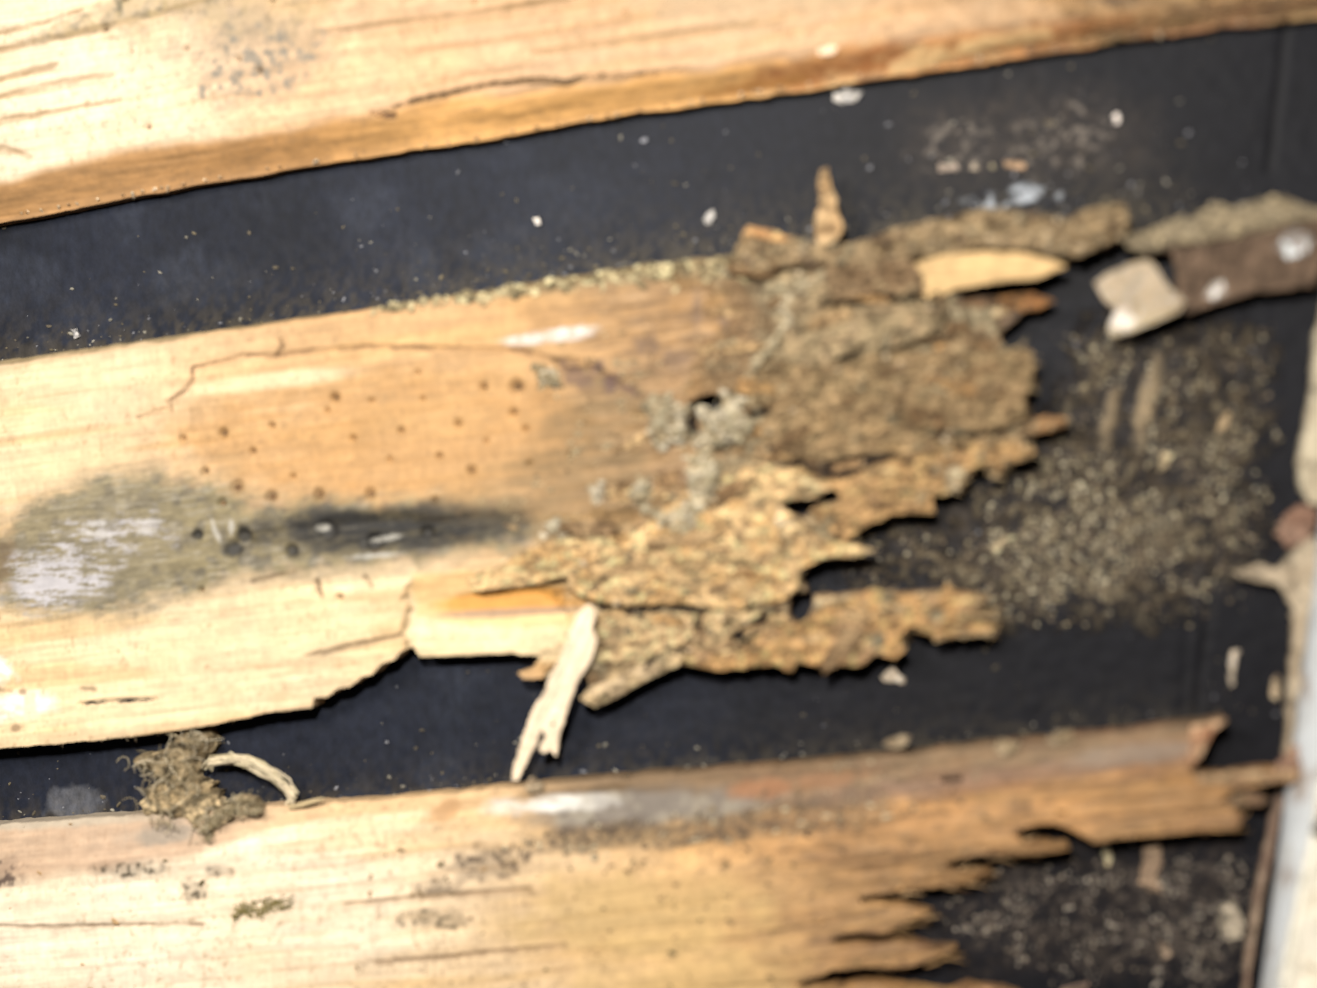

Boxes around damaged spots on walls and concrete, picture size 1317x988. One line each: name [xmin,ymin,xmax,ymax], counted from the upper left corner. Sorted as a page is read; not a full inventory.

crack [135,337,550,422]
leakage [0,345,668,646]
peeling [408,203,1129,707]
leakage [0,653,63,734]
peeling [883,735,910,749]
peeling [992,739,1020,756]
peeling [1045,729,1075,746]
peeling [1185,719,1302,806]